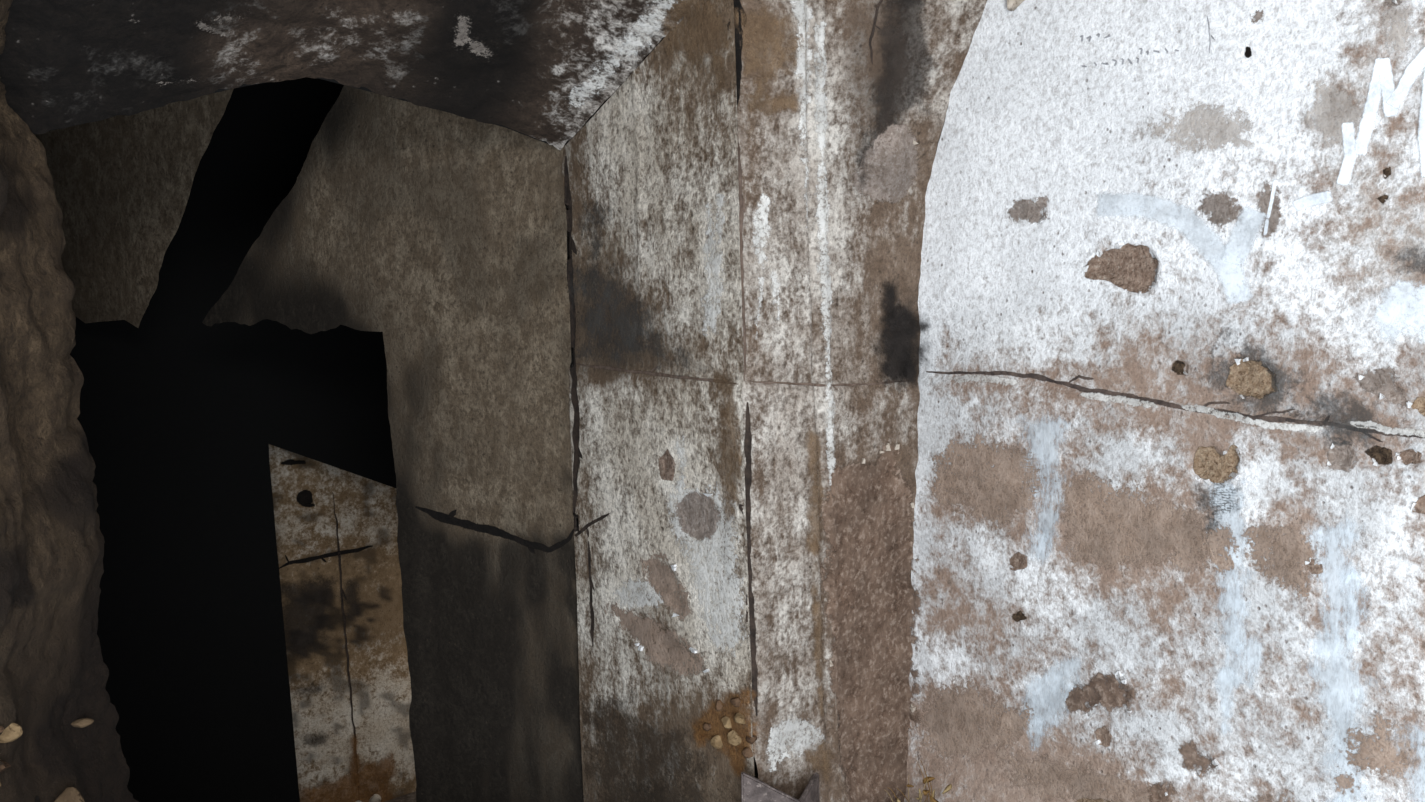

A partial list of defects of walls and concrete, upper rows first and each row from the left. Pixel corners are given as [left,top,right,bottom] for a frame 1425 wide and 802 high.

water stain [883,283,897,314]
water stain [902,363,917,384]
crack [415,0,1425,716]
spalling [1081,243,1158,294]
crack [279,492,373,773]
peeling [604,551,710,678]